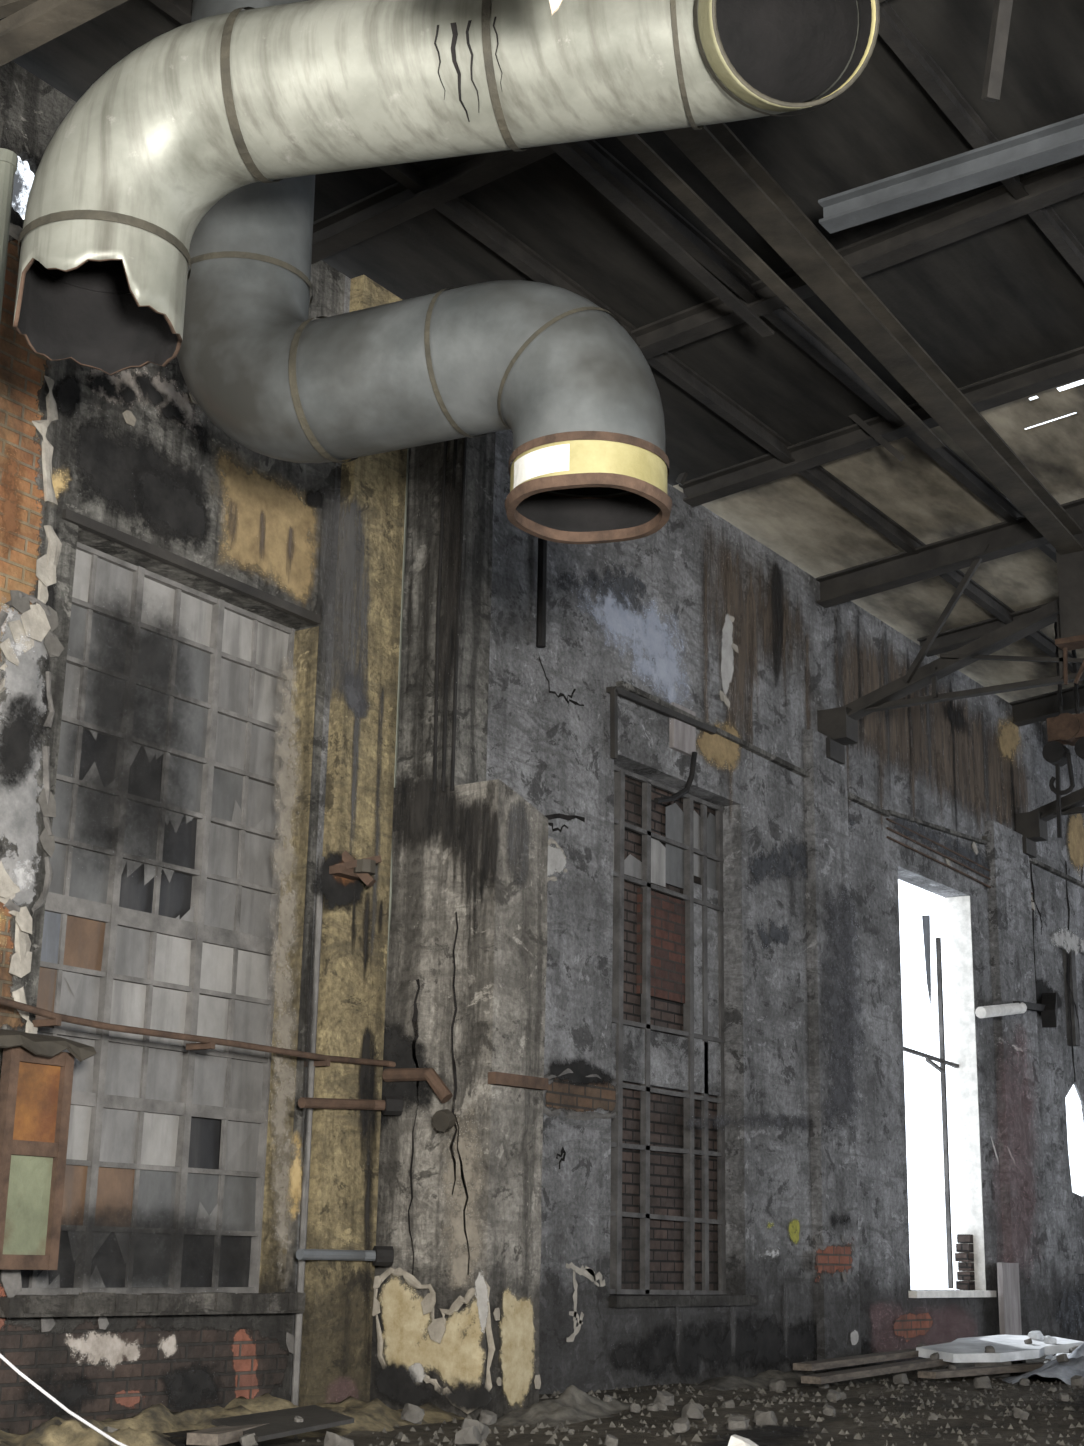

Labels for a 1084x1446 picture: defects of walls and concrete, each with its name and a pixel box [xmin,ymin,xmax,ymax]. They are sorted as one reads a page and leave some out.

peeling [549,0,563,15]
flaking render [0,223,65,1034]
water stain [837,604,926,705]
water stain [846,682,1028,831]
water stain [507,803,529,887]
water stain [748,839,808,886]
crack [408,912,470,1275]
flaking render [0,1269,22,1298]
flaking render [0,1316,294,1435]
peeling [372,1267,541,1414]